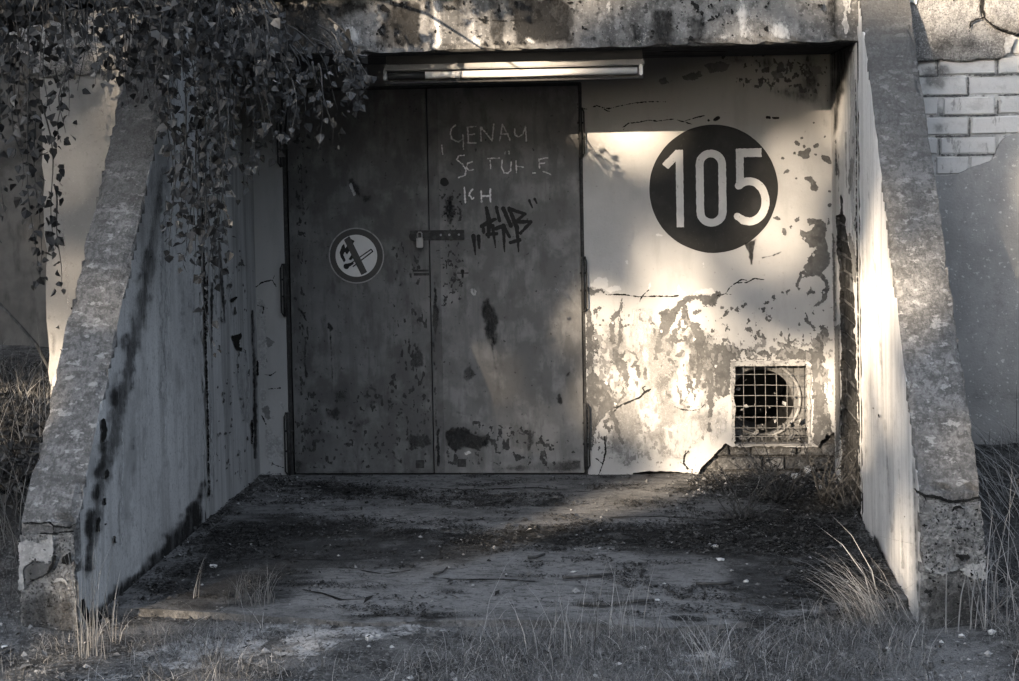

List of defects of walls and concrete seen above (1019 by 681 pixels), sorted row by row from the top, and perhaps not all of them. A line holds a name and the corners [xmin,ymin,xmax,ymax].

damp [381,2,441,48]
damp [490,0,572,46]
damp [772,23,789,39]
spalling [918,35,1019,174]
crack [606,290,679,300]
crack [717,278,764,296]
spalling [585,136,863,521]
damp [86,170,168,571]
crack [613,386,651,412]
damp [90,423,215,623]
crack [914,488,981,512]
spalling [18,532,92,630]